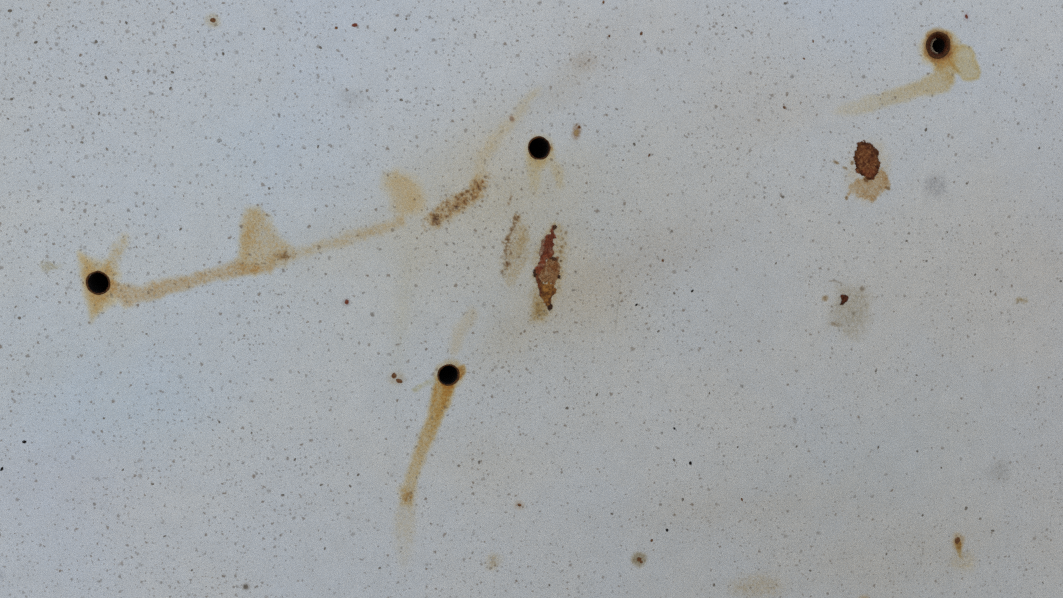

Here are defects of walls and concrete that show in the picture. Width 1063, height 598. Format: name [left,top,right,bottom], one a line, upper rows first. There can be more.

rust [74,82,573,328]
rust [832,134,897,211]
rust [830,10,983,119]
rust [385,356,468,573]